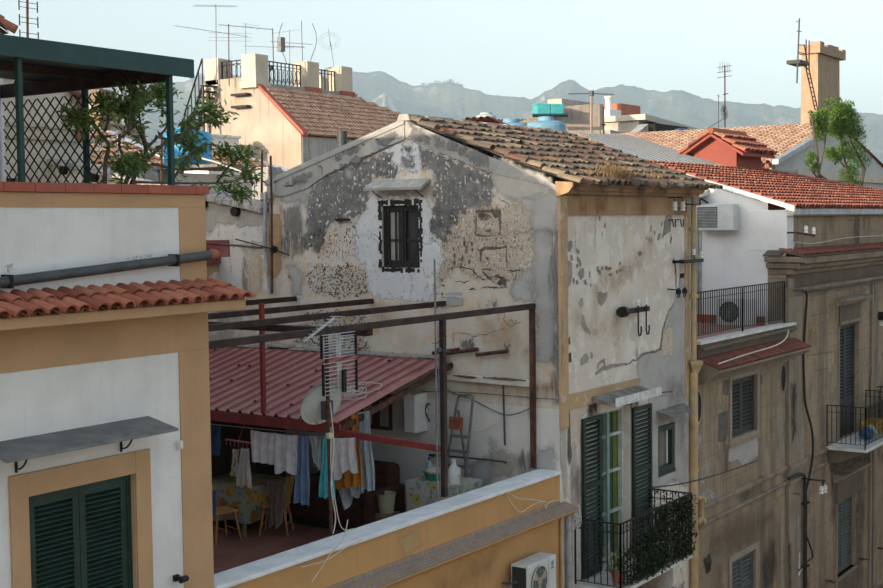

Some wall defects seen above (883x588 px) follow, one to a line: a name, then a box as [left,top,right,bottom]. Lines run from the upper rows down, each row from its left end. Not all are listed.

peeling [206,214,290,290]
peeling [305,132,533,308]
crack [449,267,523,290]
spalling [568,240,622,306]
crack [431,313,522,344]
water stain [763,516,800,588]